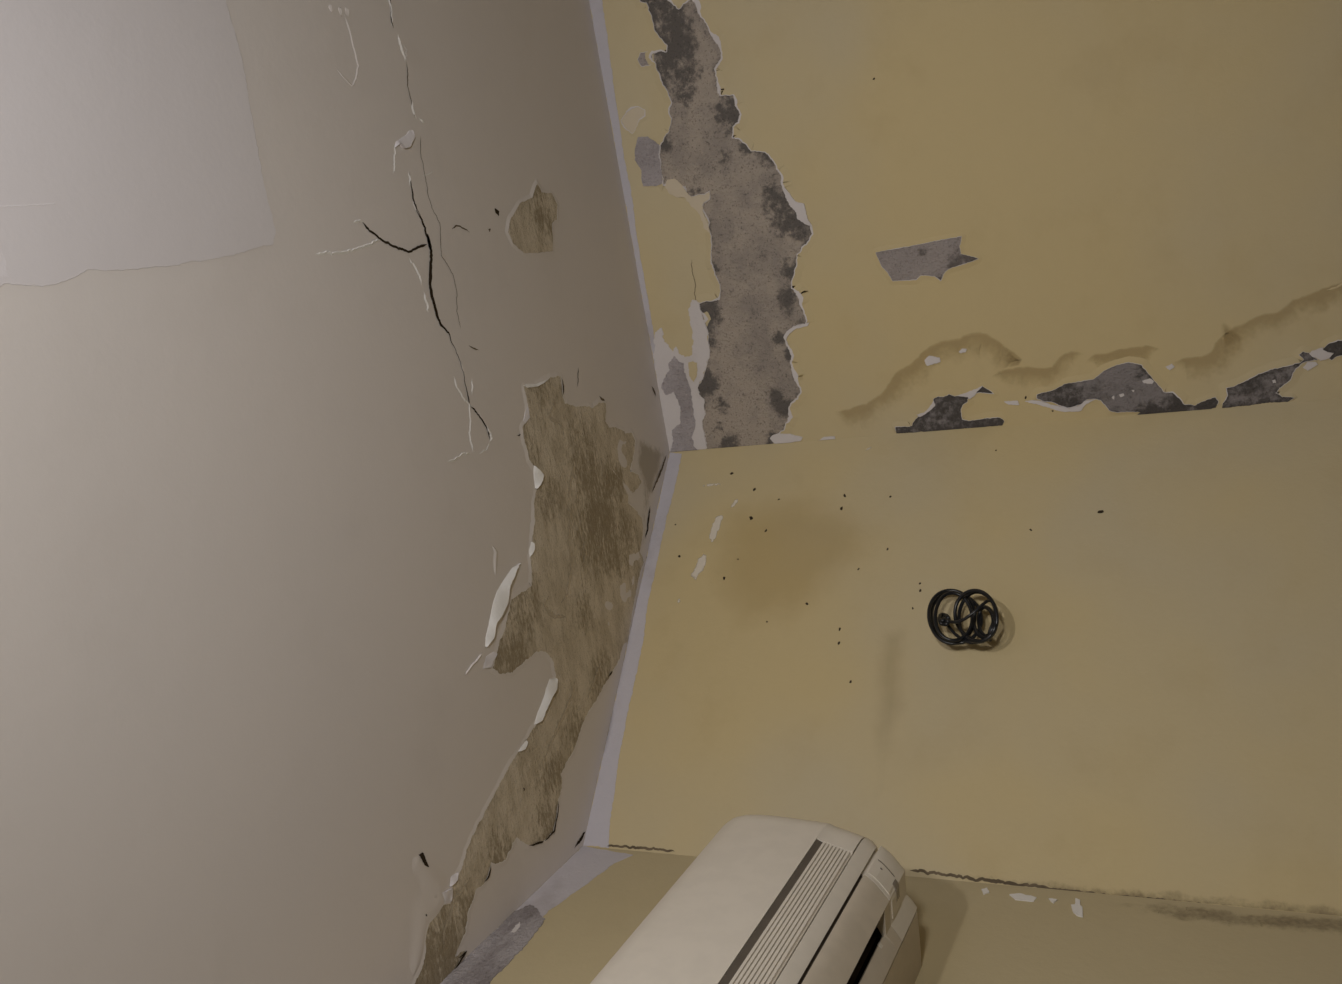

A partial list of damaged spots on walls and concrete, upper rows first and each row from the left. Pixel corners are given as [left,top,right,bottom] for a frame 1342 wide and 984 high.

peeling [0,0,276,287]
crack [315,0,493,462]
peeling [489,178,559,257]
spalling [633,0,818,452]
peeling [872,232,983,285]
spalling [891,334,1342,433]
peeling [412,371,645,984]
crack [910,869,1229,906]